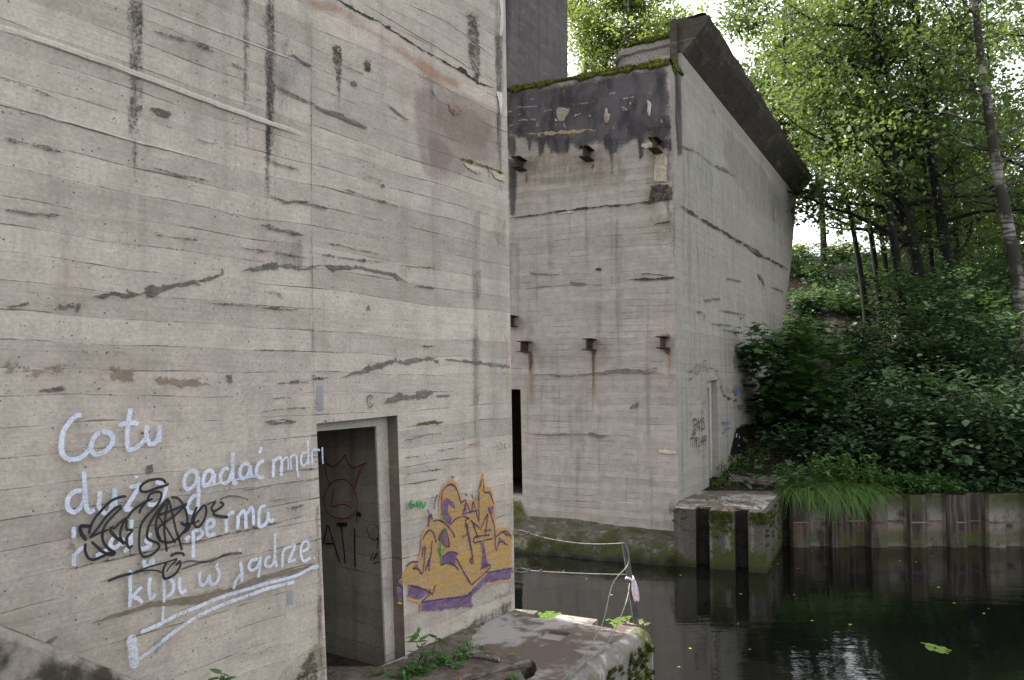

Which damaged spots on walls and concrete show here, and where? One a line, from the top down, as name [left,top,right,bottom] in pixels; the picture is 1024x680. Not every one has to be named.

leakage [130,0,143,129]
leakage [265,0,275,180]
leakage [602,138,618,173]
leakage [658,72,683,156]
crack [509,200,788,270]